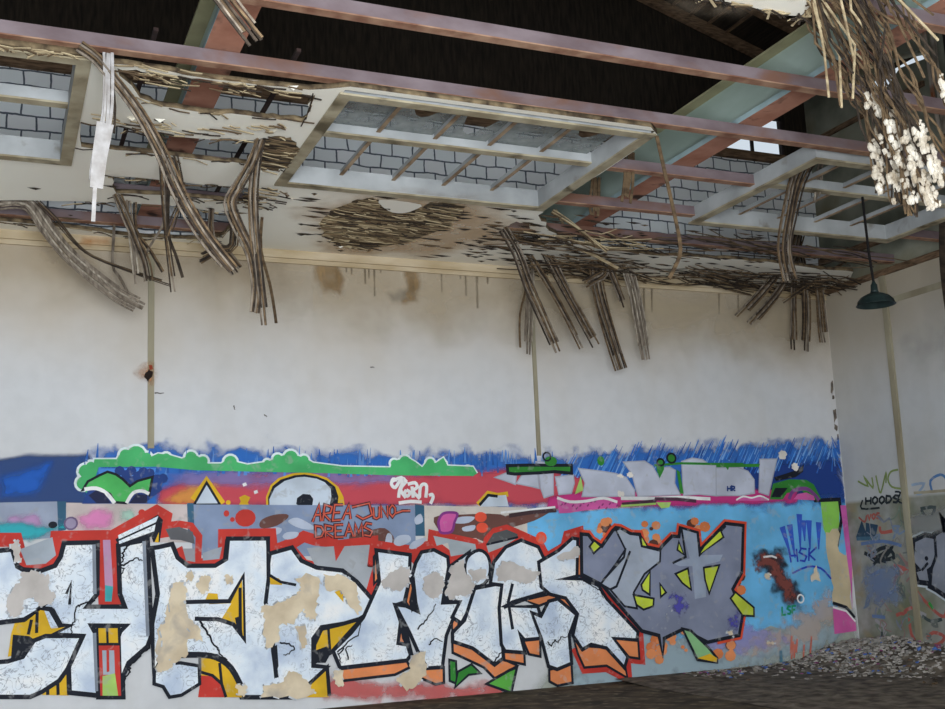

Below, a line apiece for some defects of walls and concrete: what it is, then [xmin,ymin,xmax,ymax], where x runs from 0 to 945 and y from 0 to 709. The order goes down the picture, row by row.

spalling [694,0,835,27]
flaking render [81,64,322,175]
flaking render [53,175,823,281]
damp [317,266,376,290]
damp [513,281,819,339]
peeling [5,539,57,618]
peeling [381,559,541,600]
peeling [155,570,234,674]
peeling [261,573,362,650]
peeling [235,671,316,701]
peeling [331,668,344,687]
peeling [396,651,429,691]